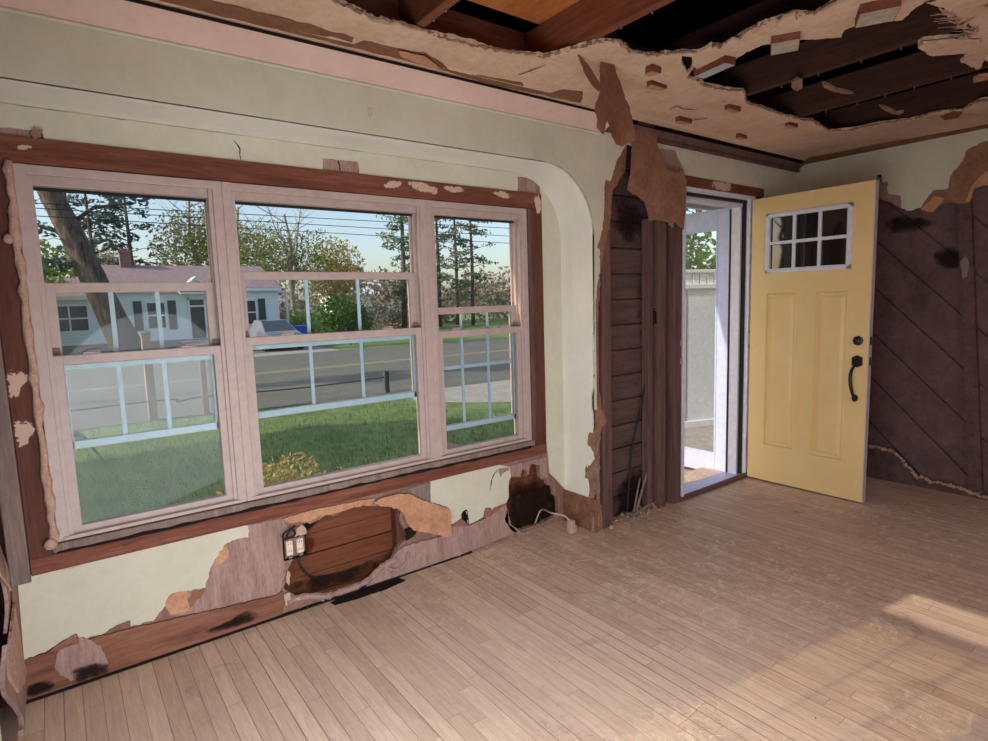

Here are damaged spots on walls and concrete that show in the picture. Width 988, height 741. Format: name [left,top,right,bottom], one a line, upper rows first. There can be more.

spalling [712,0,847,50]
spalling [918,38,981,56]
flaking render [921,141,988,213]
leakage [887,217,930,231]
leakage [934,249,959,268]
spalling [585,145,627,533]
flaking render [165,482,469,616]
flaking render [0,546,28,741]
leakage [27,682,53,696]
flaking render [46,621,131,681]
leakage [74,664,107,681]
leakage [209,612,254,632]